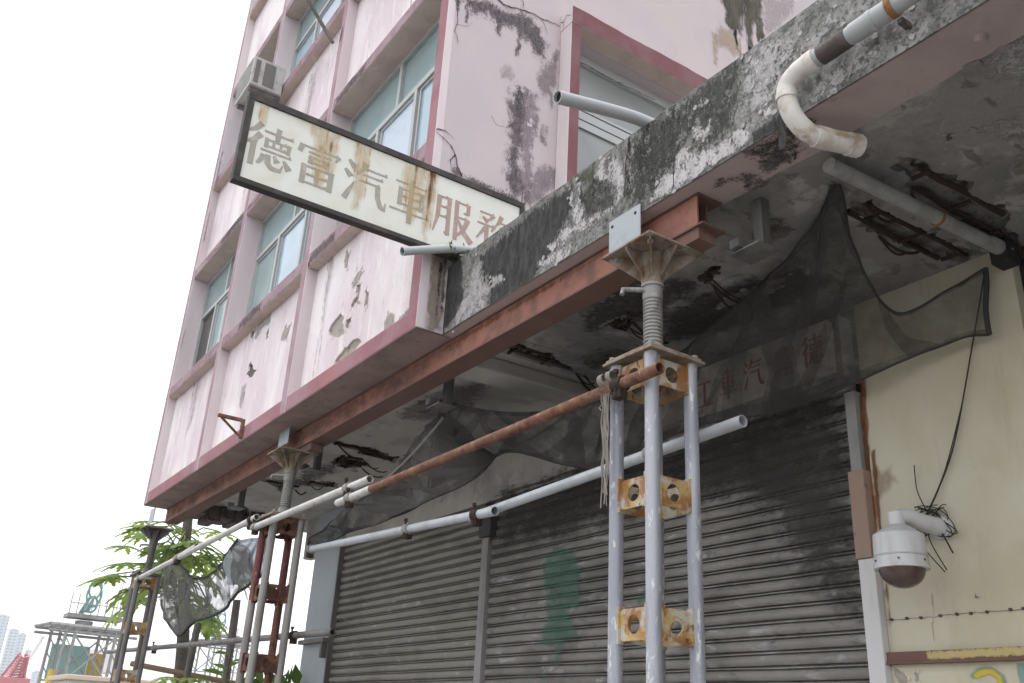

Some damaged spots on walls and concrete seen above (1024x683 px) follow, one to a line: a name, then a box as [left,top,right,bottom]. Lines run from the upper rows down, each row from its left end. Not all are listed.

crack [498,0,570,35]
leakage [452,0,765,304]
spalling [846,195,977,264]
spalling [890,155,1024,259]
spalling [328,248,370,364]
peeling [384,306,409,330]
leakage [580,281,643,332]
spalling [507,342,629,391]
spalling [329,440,400,478]